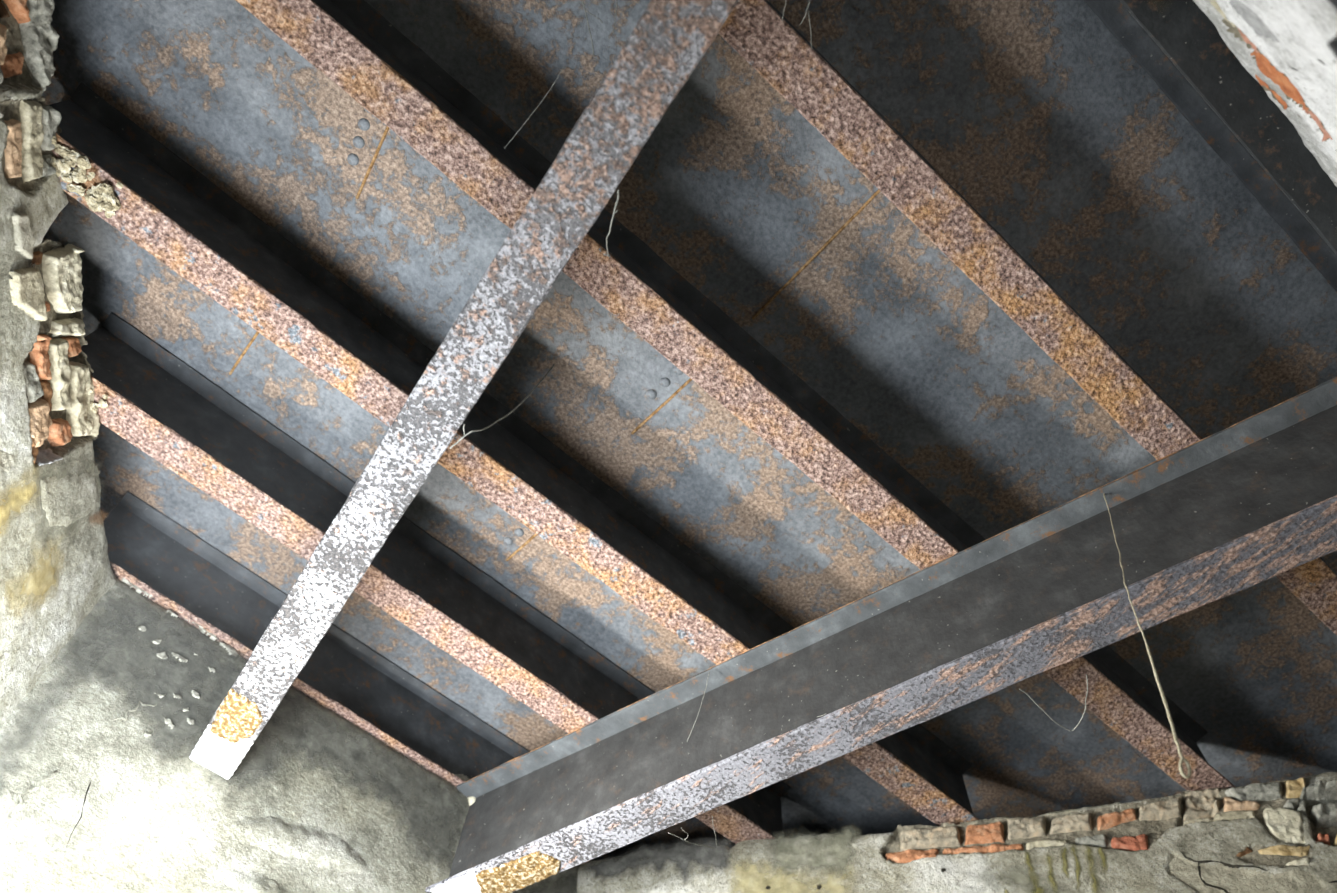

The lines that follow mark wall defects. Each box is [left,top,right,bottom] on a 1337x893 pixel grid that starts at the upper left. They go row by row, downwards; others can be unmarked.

flaking render [0,0,62,196]
flaking render [1210,0,1333,142]
flaking render [9,211,100,467]
spalling [0,450,15,472]
leakage [0,464,96,537]
flaking render [880,777,1337,893]
crack [1179,850,1267,893]